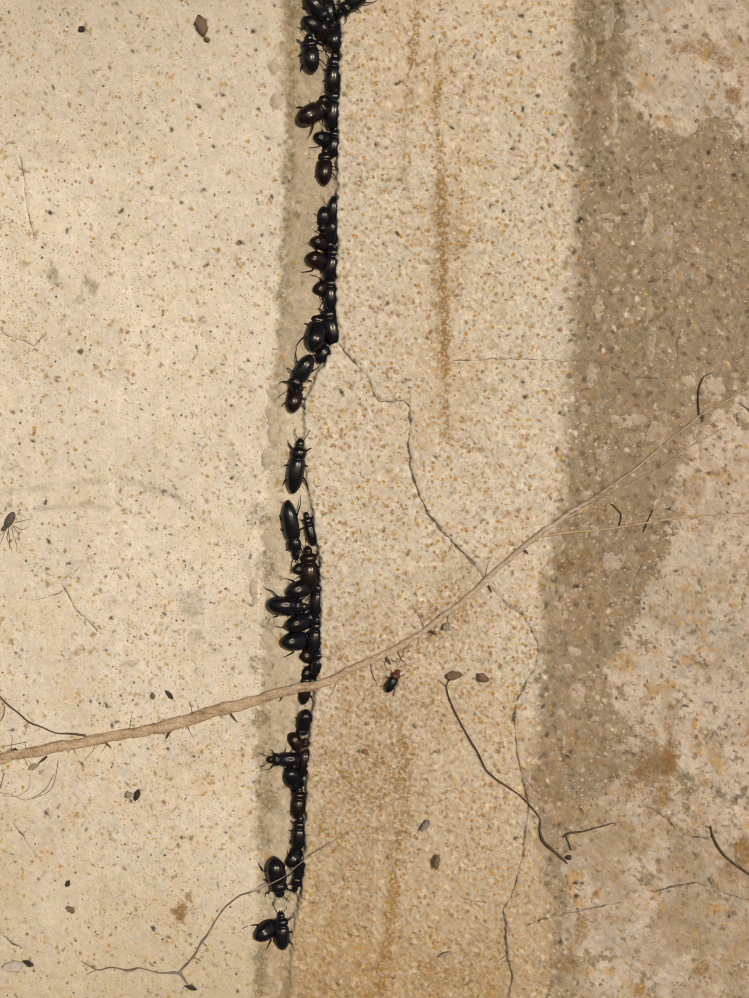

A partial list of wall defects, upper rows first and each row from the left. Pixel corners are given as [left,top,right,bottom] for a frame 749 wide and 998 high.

crack [338,342,473,564]
crack [464,682,548,991]